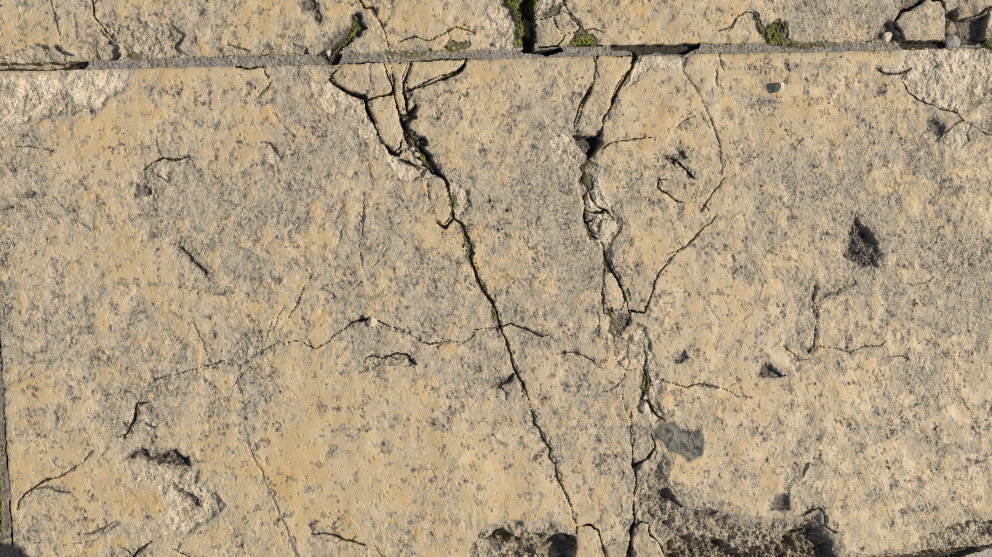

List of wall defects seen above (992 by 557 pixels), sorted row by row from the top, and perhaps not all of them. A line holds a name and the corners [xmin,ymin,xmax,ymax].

spalling [868,0,992,153]
crack [6,0,753,557]
water stain [650,418,709,465]
spalling [919,439,983,458]
spalling [634,450,992,557]
water stain [0,537,36,557]
spalling [467,518,578,557]